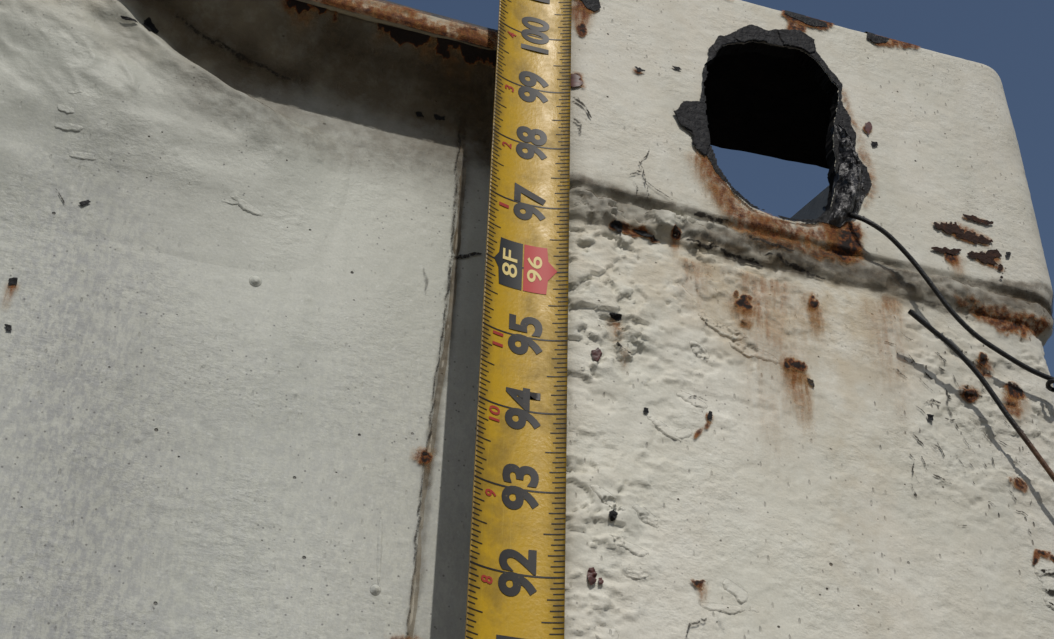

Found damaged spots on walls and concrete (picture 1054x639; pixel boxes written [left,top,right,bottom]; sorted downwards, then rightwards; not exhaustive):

corrosion [284,0,498,67]
peeling [571,0,601,37]
peeling [674,10,878,224]
corrosion [695,156,863,263]
corrosion [734,290,755,329]
corrosion [784,358,809,397]
corrosion [960,385,982,403]
corrosion [976,352,992,377]
corrosion [1004,381,1025,415]
corrosion [414,448,433,467]